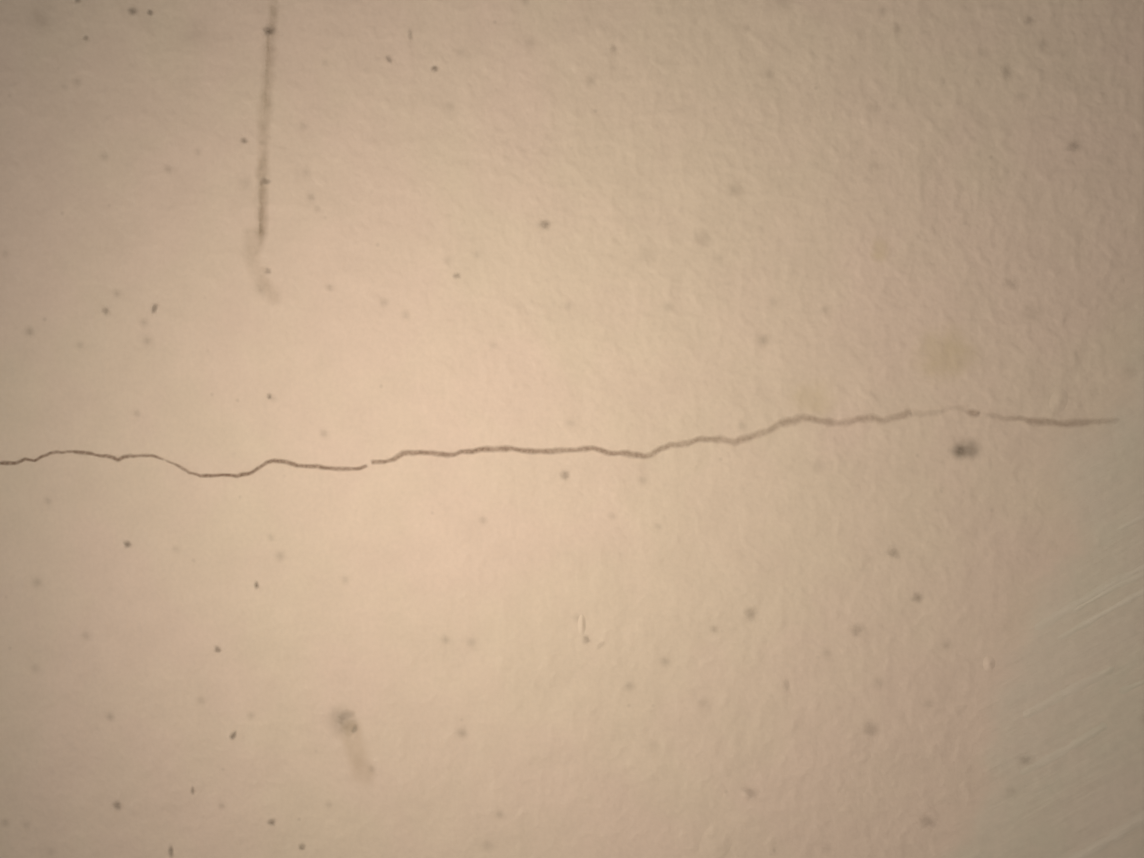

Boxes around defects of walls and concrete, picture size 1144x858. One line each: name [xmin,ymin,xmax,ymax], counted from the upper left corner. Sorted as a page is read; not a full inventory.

crack [0,451,127,464]
crack [198,460,386,477]